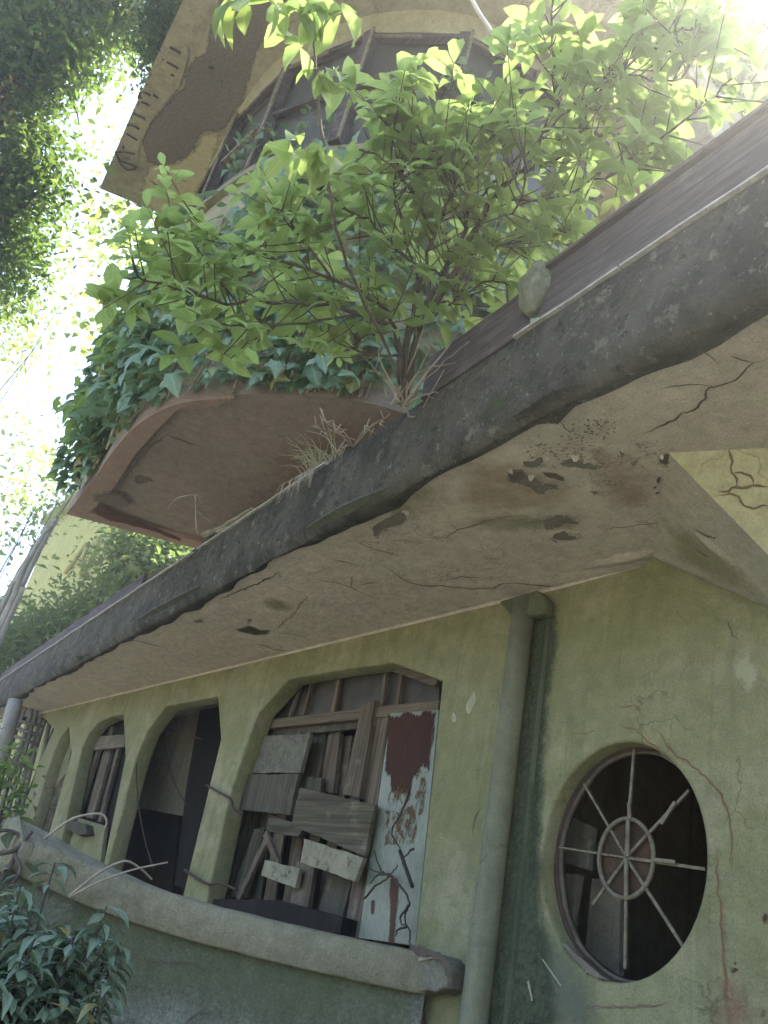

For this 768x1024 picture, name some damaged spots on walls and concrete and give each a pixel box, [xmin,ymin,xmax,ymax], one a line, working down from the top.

spalling [115,45,219,212]
crack [643,353,766,435]
crack [718,450,768,510]
spalling [369,510,410,538]
spalling [539,513,582,543]
crack [218,515,552,651]
rust [384,711,436,845]
crack [618,699,732,1024]
rust [388,878,398,944]
crack [587,1002,665,1010]